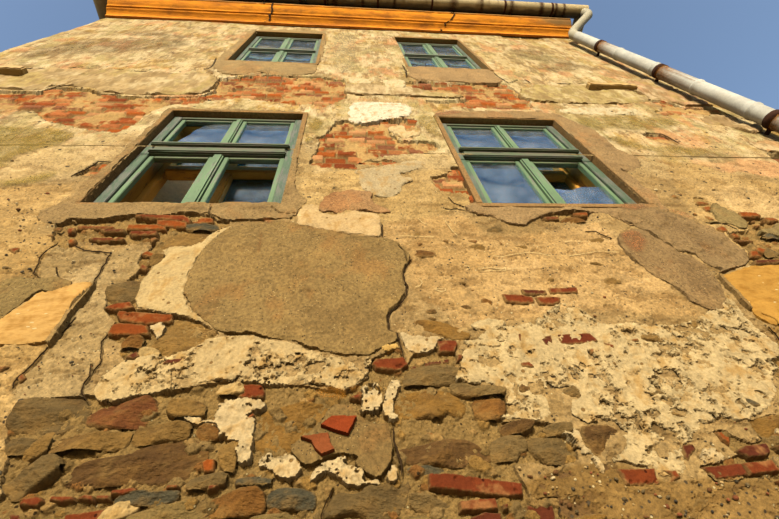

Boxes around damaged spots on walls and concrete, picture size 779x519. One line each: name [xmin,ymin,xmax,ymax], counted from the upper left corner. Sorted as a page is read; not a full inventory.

spalling [311,119,438,170]
spalling [0,67,779,162]
crack [33,243,111,283]
spalling [46,214,229,365]
crack [381,225,412,358]
spalling [692,198,779,266]
crack [12,347,48,389]
crack [80,334,108,403]
spalling [632,334,663,343]
spalling [0,309,618,519]
spalling [616,468,680,486]
spalling [700,414,779,487]